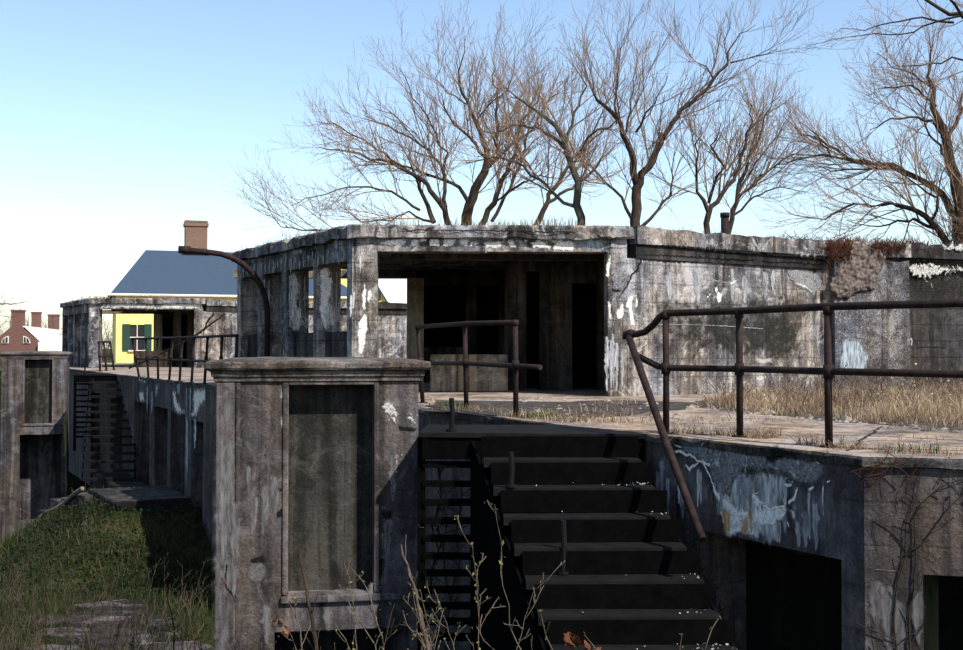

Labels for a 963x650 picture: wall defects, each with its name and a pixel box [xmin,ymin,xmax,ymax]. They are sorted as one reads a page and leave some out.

peeling [350,285,372,353]
peeling [608,295,638,325]
peeling [604,334,624,391]
spalling [670,435,824,497]